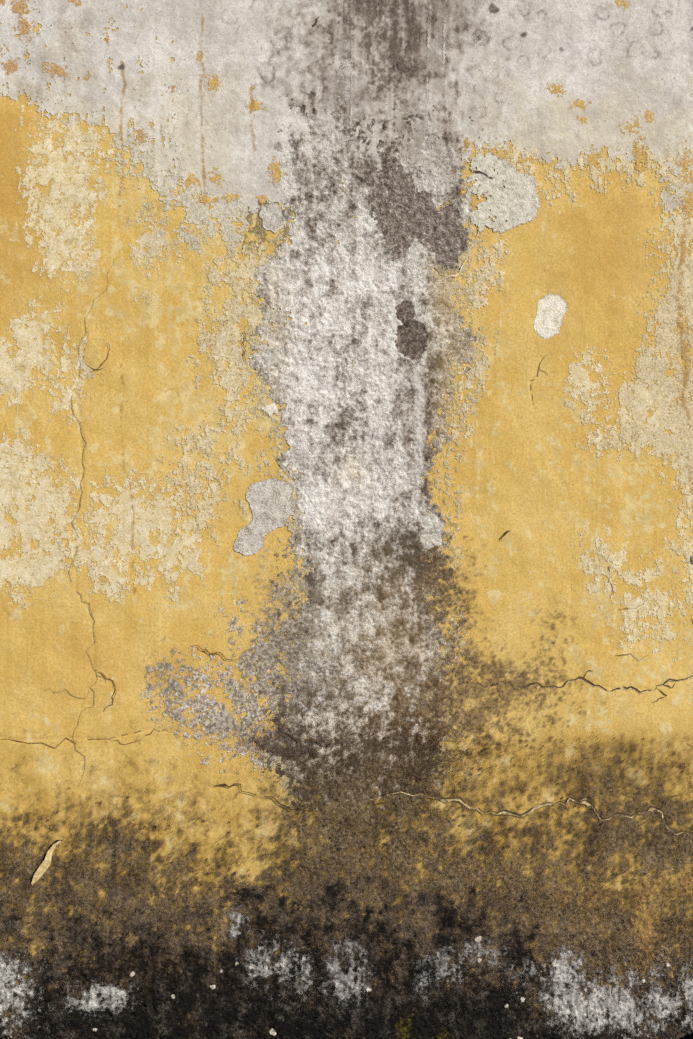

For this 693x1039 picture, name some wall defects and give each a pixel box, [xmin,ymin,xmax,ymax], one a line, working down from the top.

leakage [328,0,468,99]
peeling [0,0,693,828]
leakage [408,364,433,494]
crack [10,263,169,780]
crack [457,670,693,703]
crack [213,783,298,810]
leakage [0,728,693,1039]
crack [367,790,693,864]